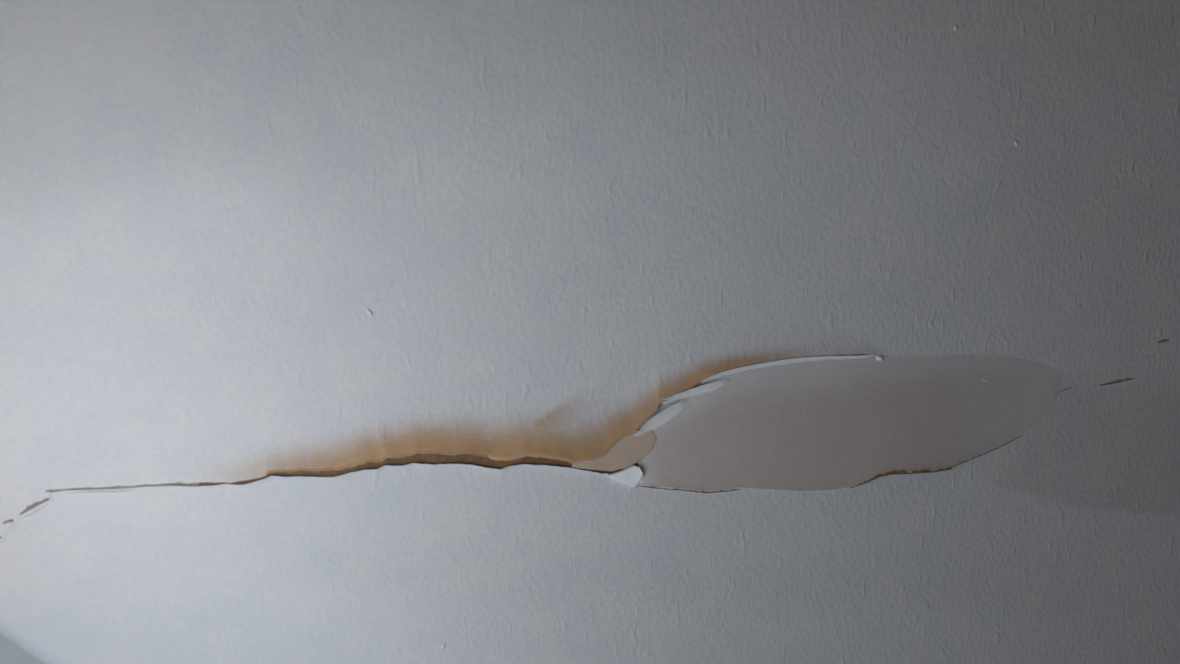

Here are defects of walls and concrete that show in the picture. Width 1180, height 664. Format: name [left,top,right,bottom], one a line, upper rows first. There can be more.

leakage [313,359,765,469]
peeling [572,353,1062,493]
crack [1058,378,1135,397]
crack [0,453,672,568]